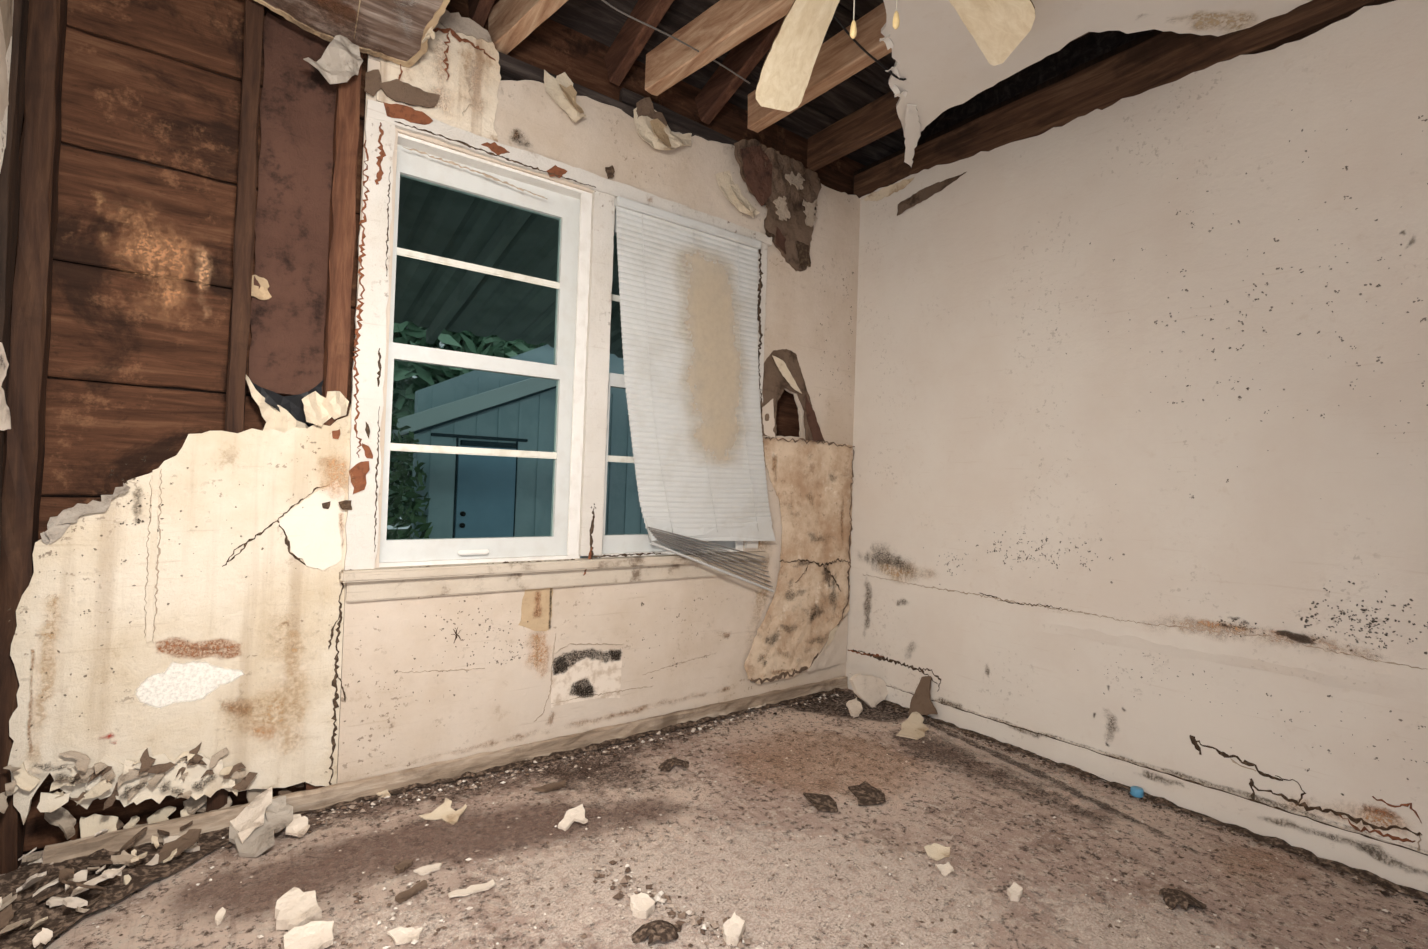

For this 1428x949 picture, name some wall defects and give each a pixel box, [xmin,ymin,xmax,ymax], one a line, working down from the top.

mould [1154,243,1349,360]
water stain [1173,574,1428,657]
flaking render [0,742,258,814]
crack [1190,735,1422,851]